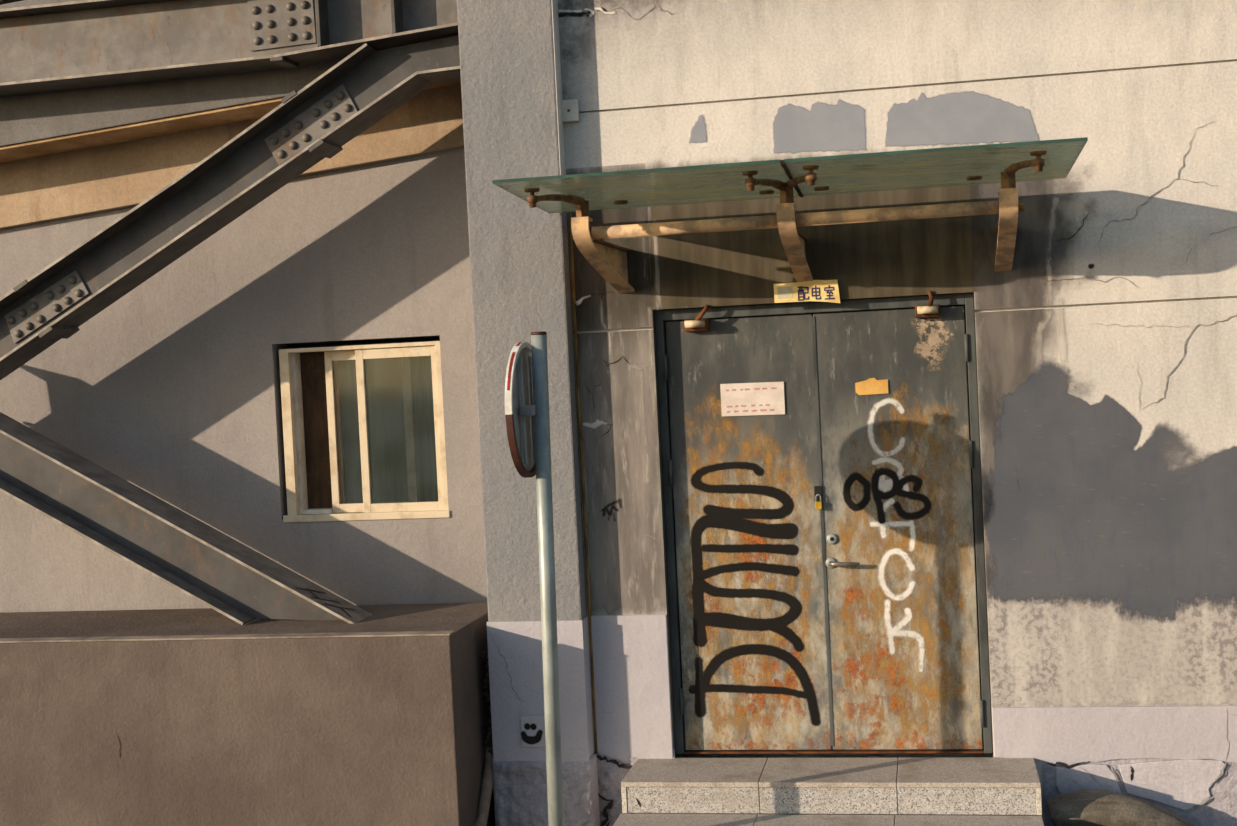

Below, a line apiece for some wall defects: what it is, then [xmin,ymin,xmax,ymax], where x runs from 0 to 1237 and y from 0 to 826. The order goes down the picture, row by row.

peeling [773,100,867,154]
peeling [885,91,1039,146]
crack [1054,121,1218,241]
damp [571,179,1075,615]
peeling [913,318,954,371]
crack [1089,315,1237,411]
rust [681,393,982,749]
flaking render [987,589,1237,707]
crack [1047,762,1134,793]
crack [1183,708,1237,812]